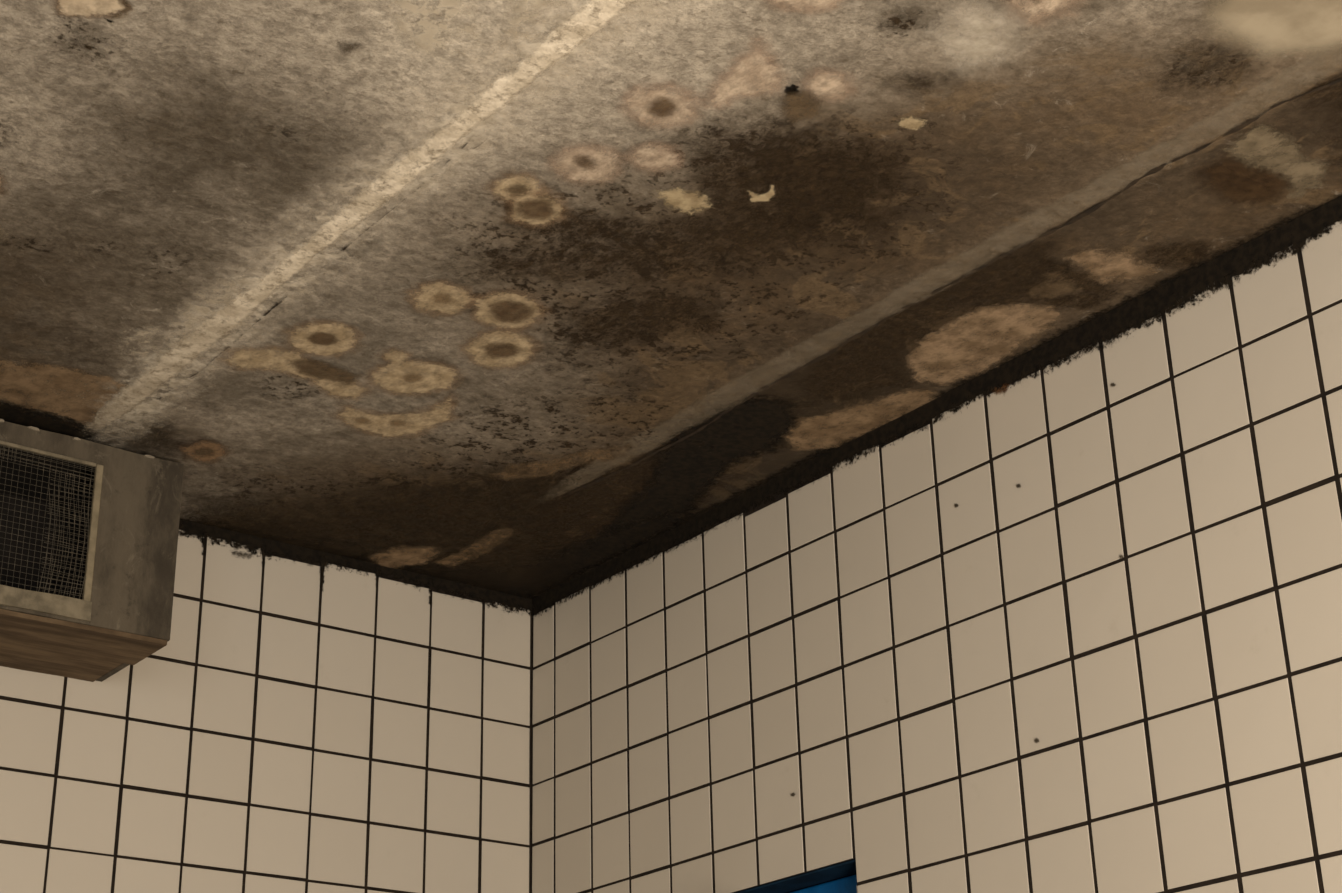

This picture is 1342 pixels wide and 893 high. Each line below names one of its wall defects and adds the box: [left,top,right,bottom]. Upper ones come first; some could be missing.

flaking render [56,0,131,18]
water stain [337,0,589,206]
water stain [410,49,933,368]
water stain [1201,161,1291,202]
water stain [0,195,1342,618]
flaking render [785,304,1060,450]